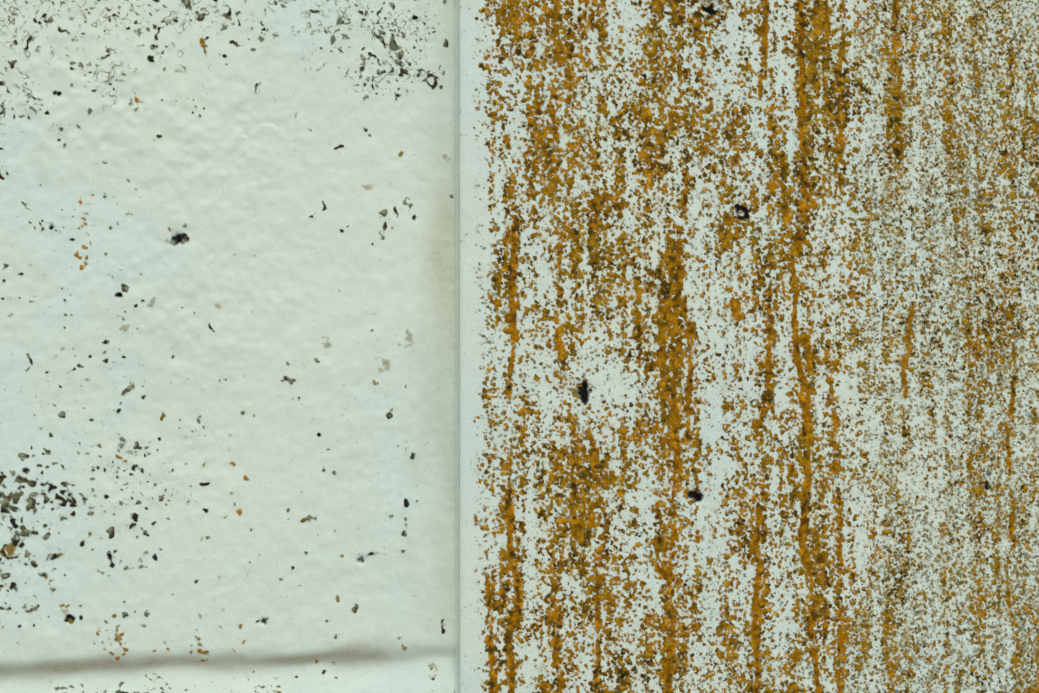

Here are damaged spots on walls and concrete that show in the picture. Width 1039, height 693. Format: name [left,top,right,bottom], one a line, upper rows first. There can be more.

corrosion [473,0,1039,693]